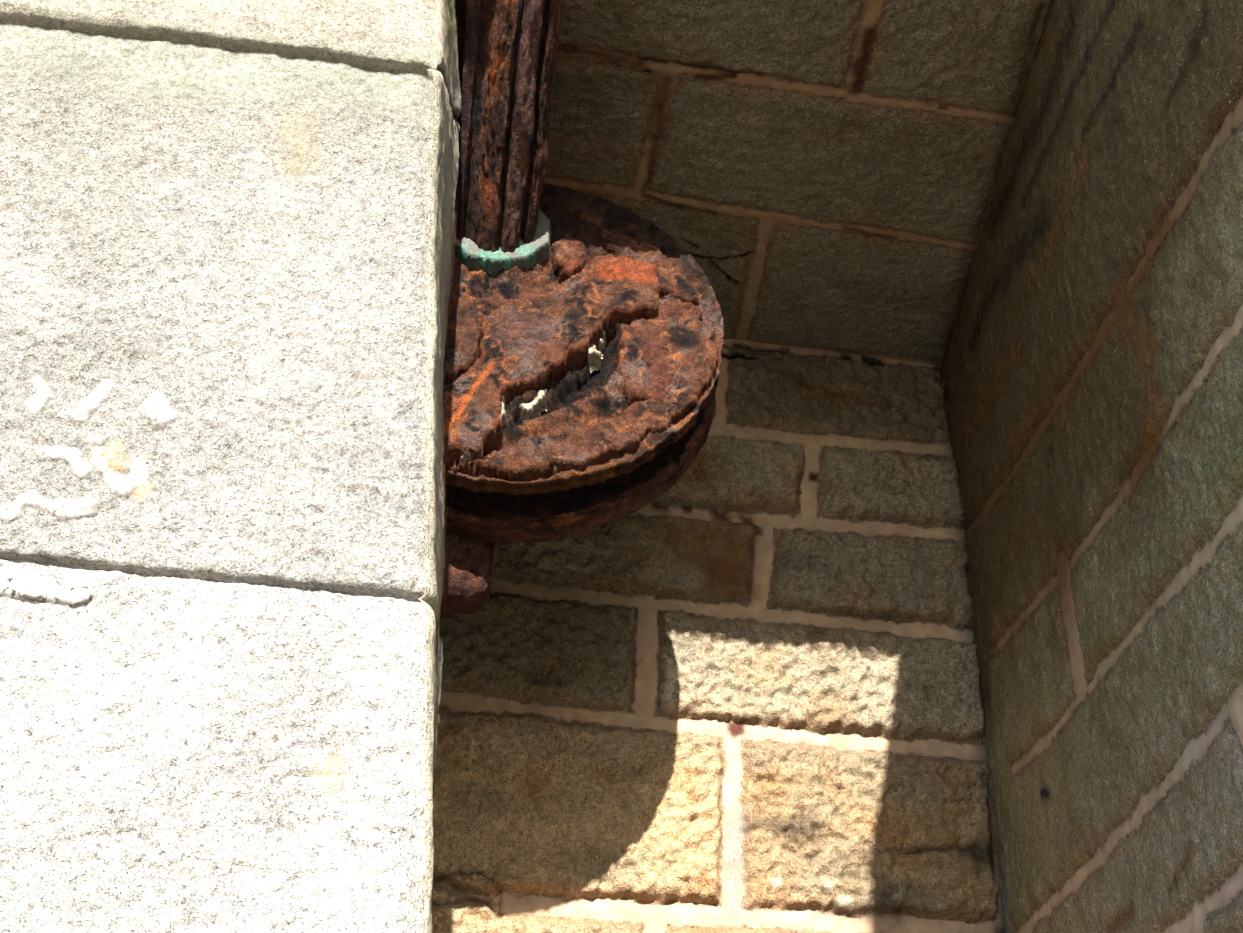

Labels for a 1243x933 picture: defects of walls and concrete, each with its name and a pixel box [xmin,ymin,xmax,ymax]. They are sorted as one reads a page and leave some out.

crack [680,238,755,284]